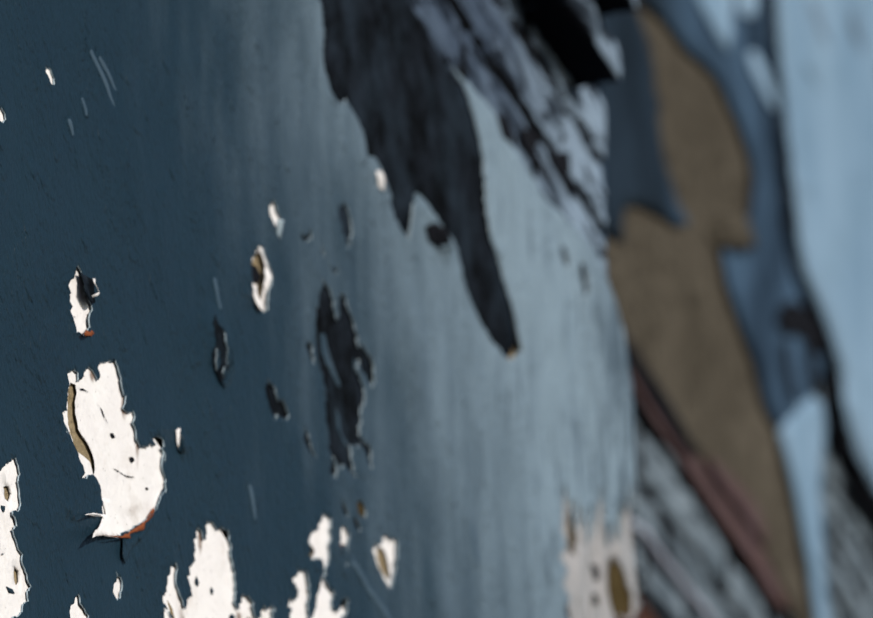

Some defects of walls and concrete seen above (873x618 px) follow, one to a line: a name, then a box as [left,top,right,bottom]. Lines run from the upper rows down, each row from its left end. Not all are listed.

peeling [69,267,100,336]
peeling [251,246,272,312]
peeling [270,201,284,239]
peeling [320,0,515,358]
spalling [606,0,830,618]
peeling [306,283,371,477]
peeling [62,361,165,564]
peeling [0,458,29,618]
peeling [163,522,274,618]
peeling [289,516,346,618]
peeling [373,534,397,588]
peeling [561,488,639,618]